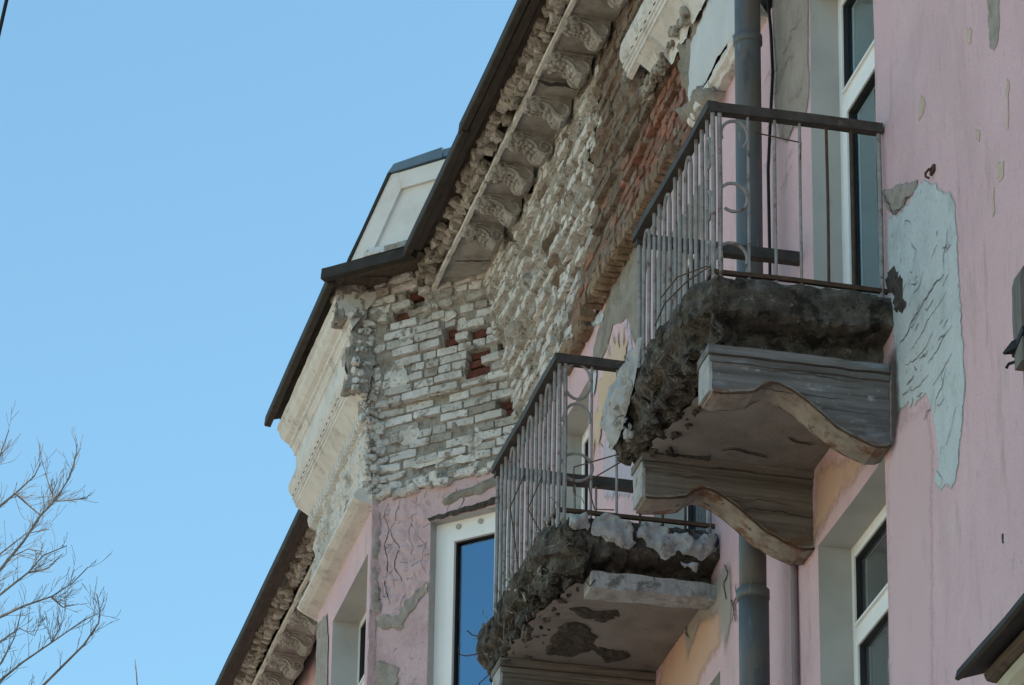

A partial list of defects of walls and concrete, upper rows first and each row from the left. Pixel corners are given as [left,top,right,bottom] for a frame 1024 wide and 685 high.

peeling [987,0,1000,50]
crack [368,482,479,605]
flaking render [330,0,735,685]
crack [893,220,955,445]
peeling [883,180,965,685]